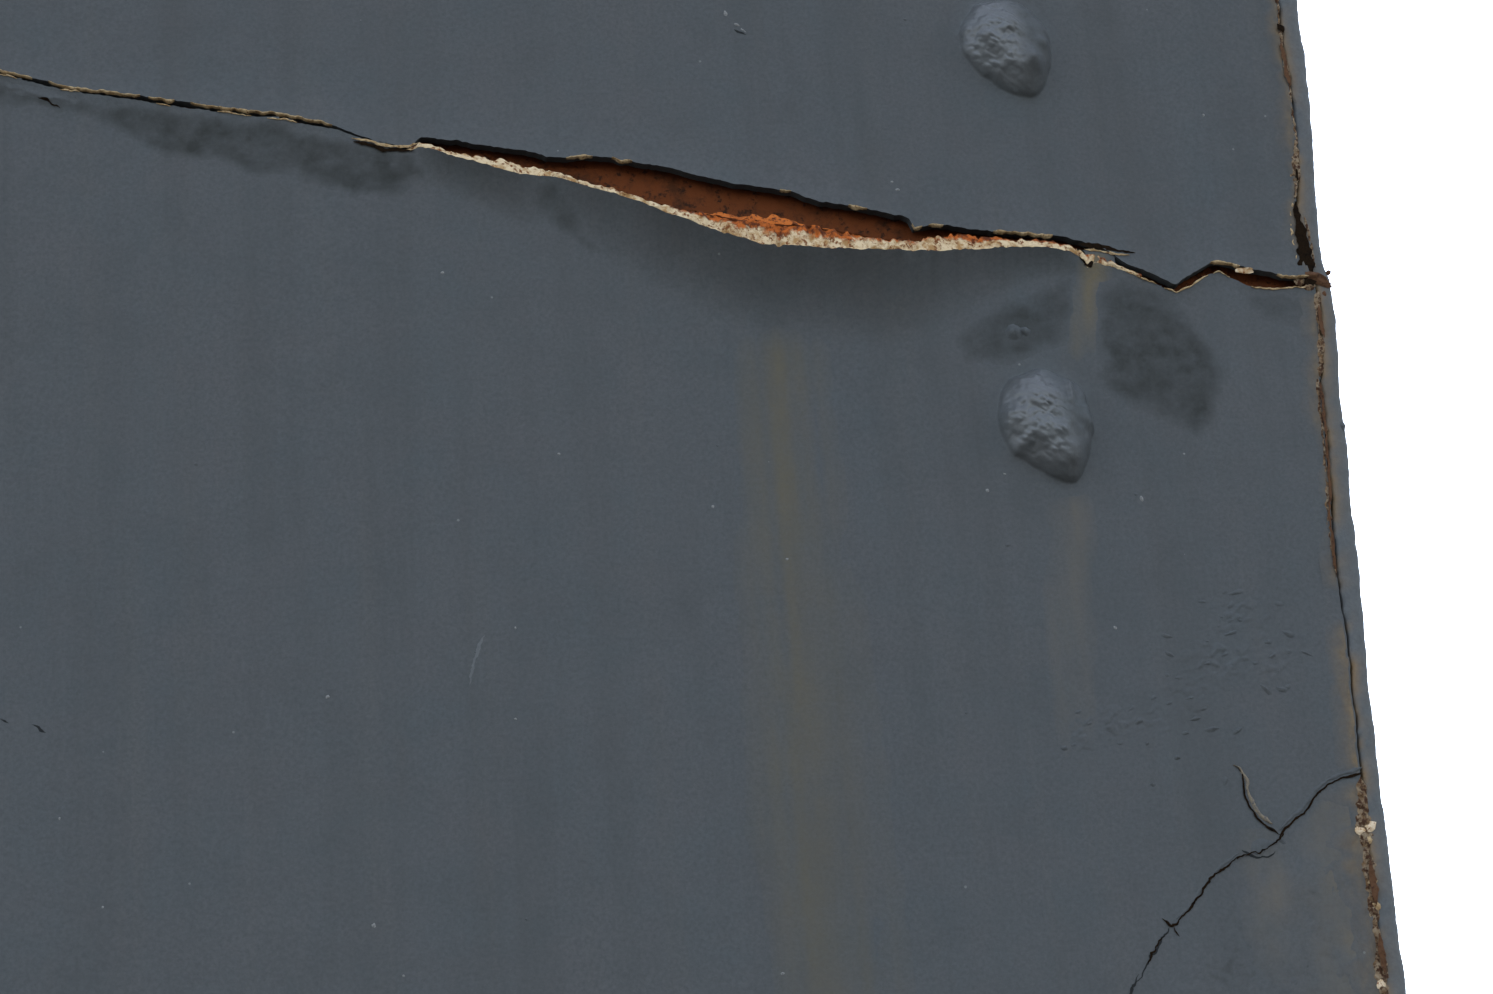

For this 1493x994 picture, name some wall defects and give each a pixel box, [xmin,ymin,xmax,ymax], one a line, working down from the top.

crack [0,69,419,152]
rust [421,142,1116,362]
leakage [953,276,1074,365]
leakage [1095,275,1231,438]
crack [1130,765,1363,994]